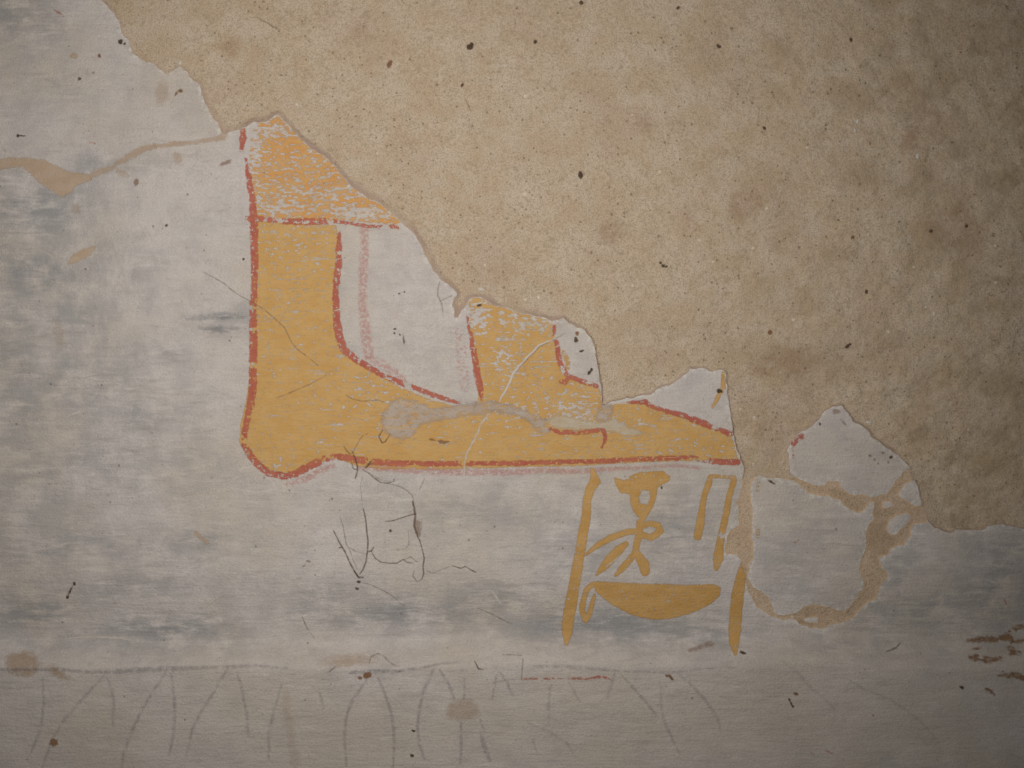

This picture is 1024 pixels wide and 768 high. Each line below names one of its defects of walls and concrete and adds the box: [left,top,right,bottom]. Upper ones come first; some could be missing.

spalling [102,0,1024,533]
crack [347,333,564,497]
crack [338,513,397,578]